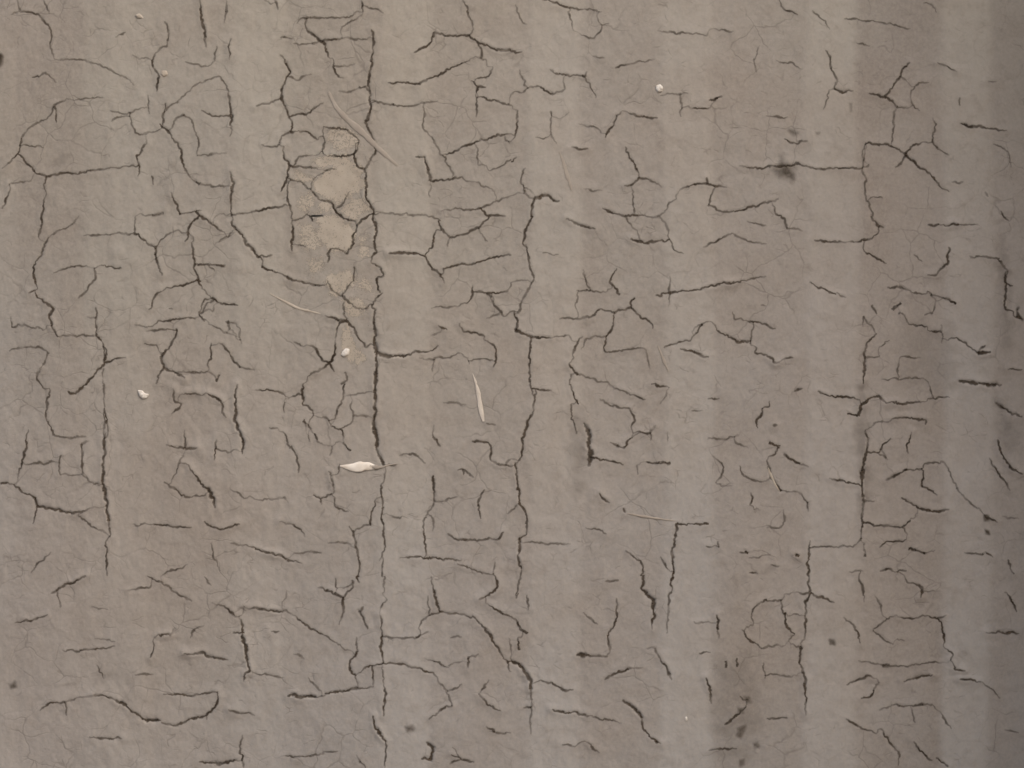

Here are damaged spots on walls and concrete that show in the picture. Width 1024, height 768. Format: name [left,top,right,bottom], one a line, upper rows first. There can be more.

crack [24,7,52,43]
crack [18,578,81,623]
crack [0,138,121,568]
peeling [293,127,377,366]
crack [68,0,800,764]
crack [631,522,832,719]
crack [747,52,1002,263]
crack [795,223,1022,767]